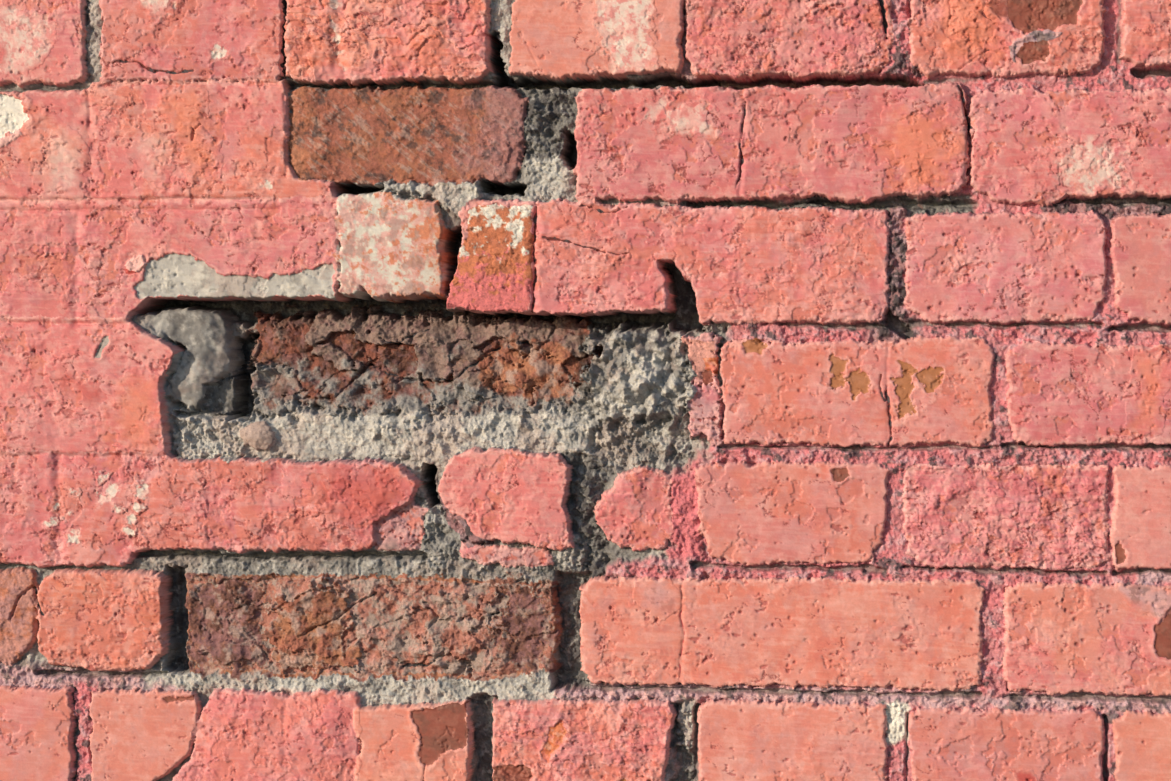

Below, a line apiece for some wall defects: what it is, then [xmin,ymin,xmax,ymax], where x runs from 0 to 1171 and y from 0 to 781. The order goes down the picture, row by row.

peeling [134,0,180,30]
peeling [209,43,227,61]
peeling [325,0,350,72]
peeling [1007,0,1083,64]
crack [736,101,746,184]
crack [957,50,989,176]
spalling [134,85,604,463]
peeling [829,353,871,400]
peeling [891,360,944,419]
spalling [163,558,573,703]
peeling [1154,614,1171,660]
peeling [411,701,469,765]